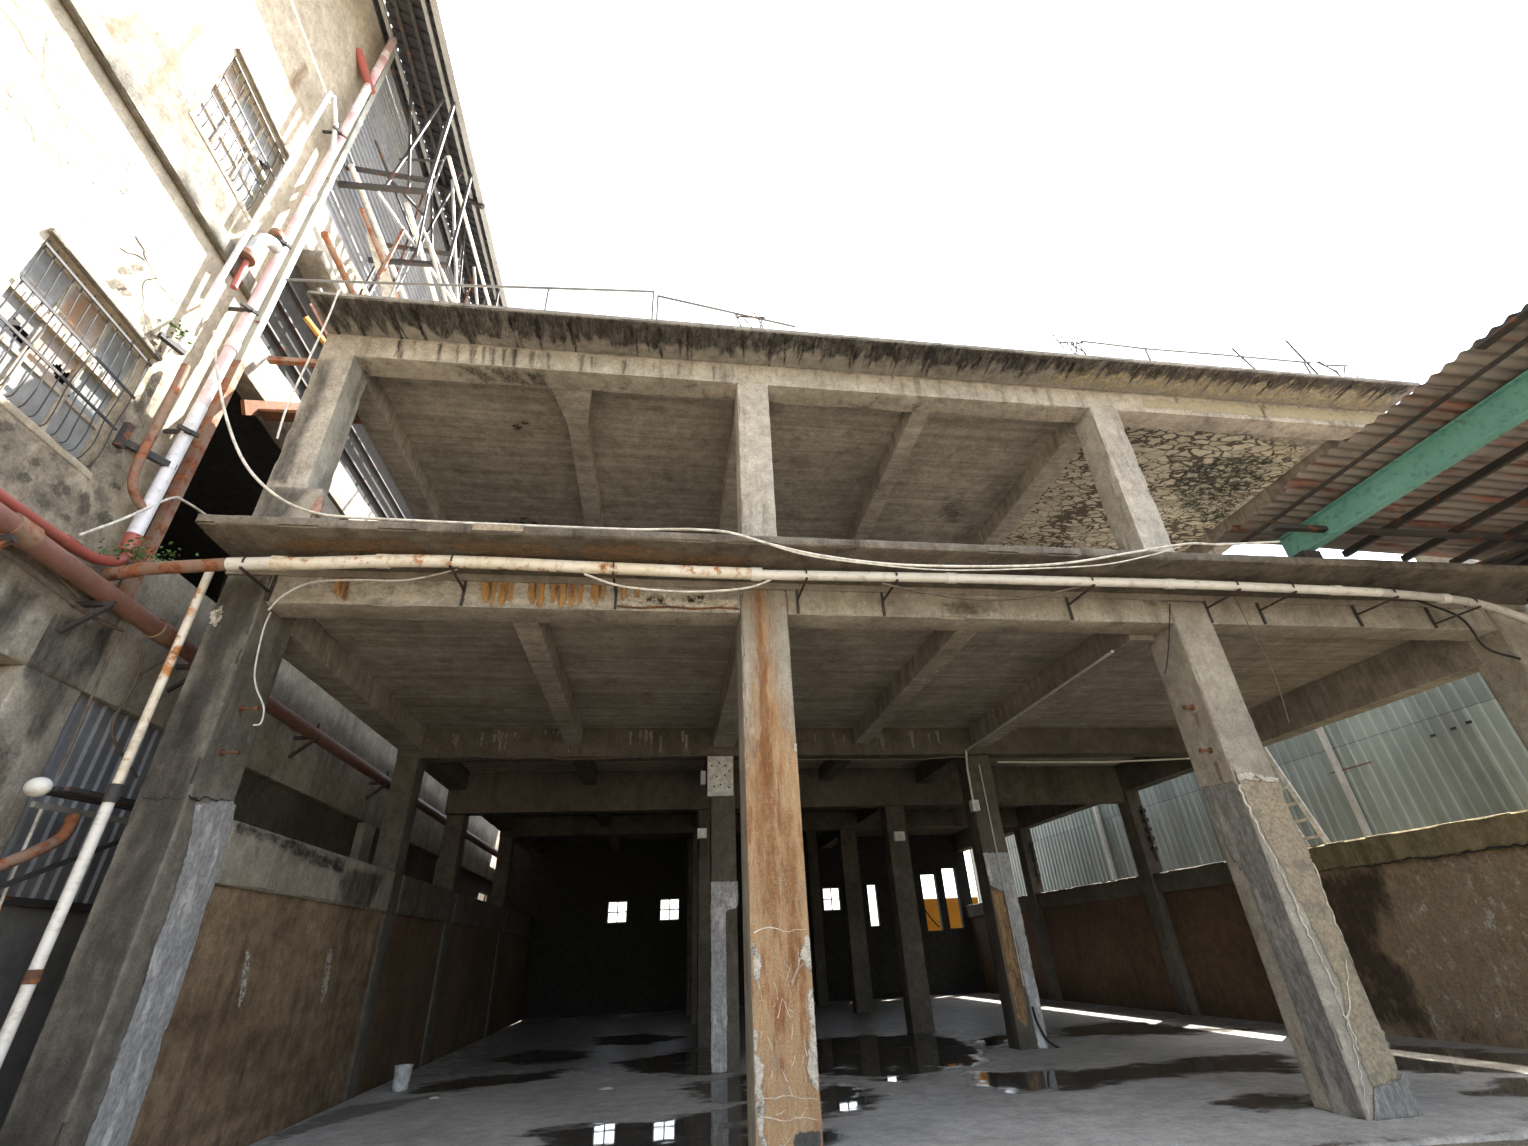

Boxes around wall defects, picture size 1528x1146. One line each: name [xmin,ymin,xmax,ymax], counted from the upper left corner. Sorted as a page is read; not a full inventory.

peeling [40,30,90,134]
damp [311,294,1414,424]
damp [1170,453,1289,523]
rust [481,582,639,607]
rust [746,589,823,1146]
crack [754,927,805,1018]
rust [992,890,1027,1026]
damp [1321,867,1439,1036]
crack [763,1095,817,1121]